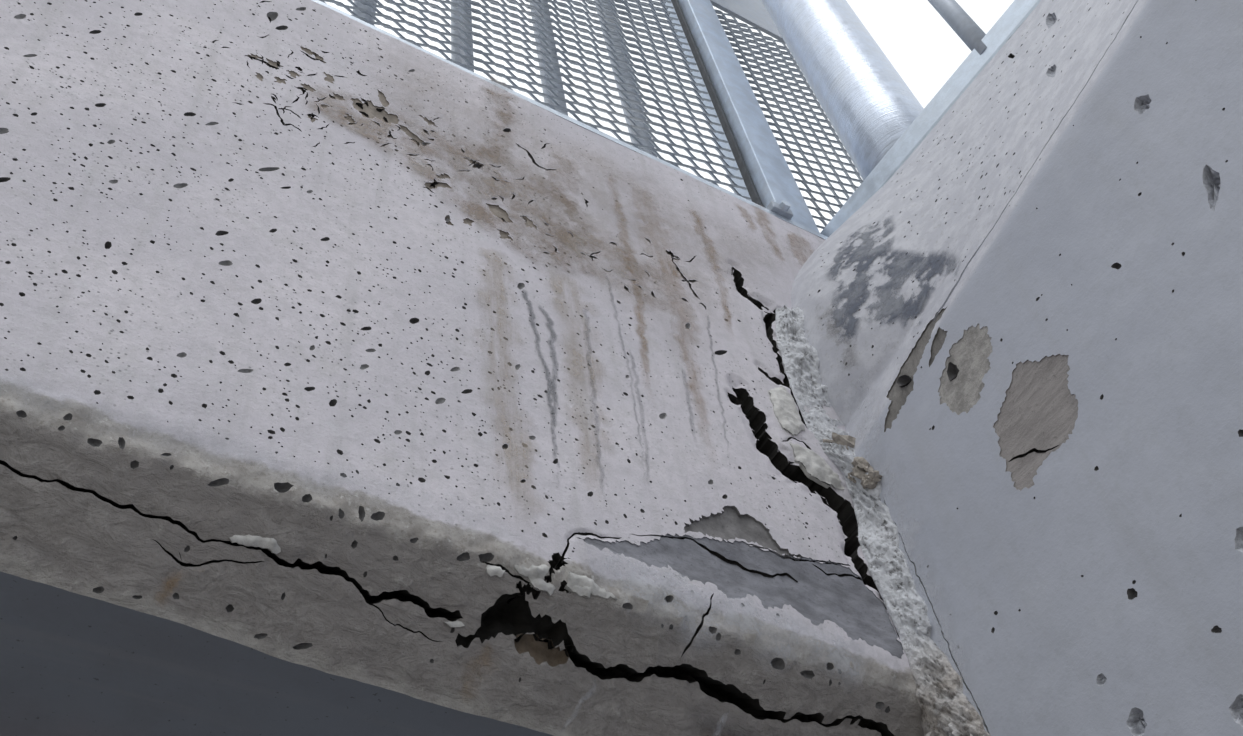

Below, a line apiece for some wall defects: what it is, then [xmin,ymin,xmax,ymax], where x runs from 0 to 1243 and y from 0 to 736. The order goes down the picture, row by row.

crack [210,1,706,309]
leakage [449,135,656,279]
leakage [523,291,557,453]
crack [671,267,900,639]
peeling [884,307,993,432]
peeling [993,354,1078,491]
crack [0,460,463,642]
crack [482,532,632,587]
crack [564,593,895,736]
spalling [575,505,904,659]
crack [883,498,990,734]